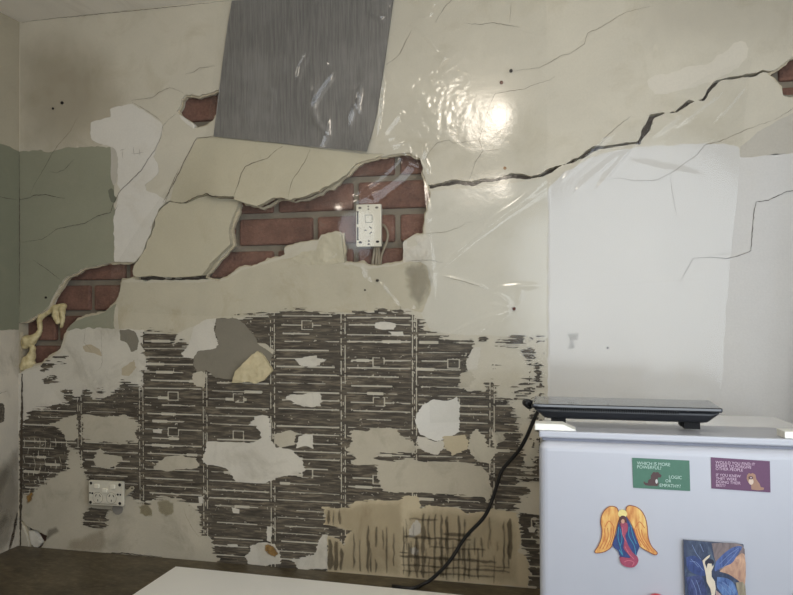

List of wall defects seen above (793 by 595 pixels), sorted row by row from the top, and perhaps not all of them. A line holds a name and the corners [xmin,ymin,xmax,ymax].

flaking render [178,91,219,129]
crack [426,7,760,189]
flaking render [767,58,793,98]
crack [0,88,176,317]
crack [140,273,214,281]
crack [163,136,278,203]
crack [682,190,793,278]
peeling [0,104,793,562]